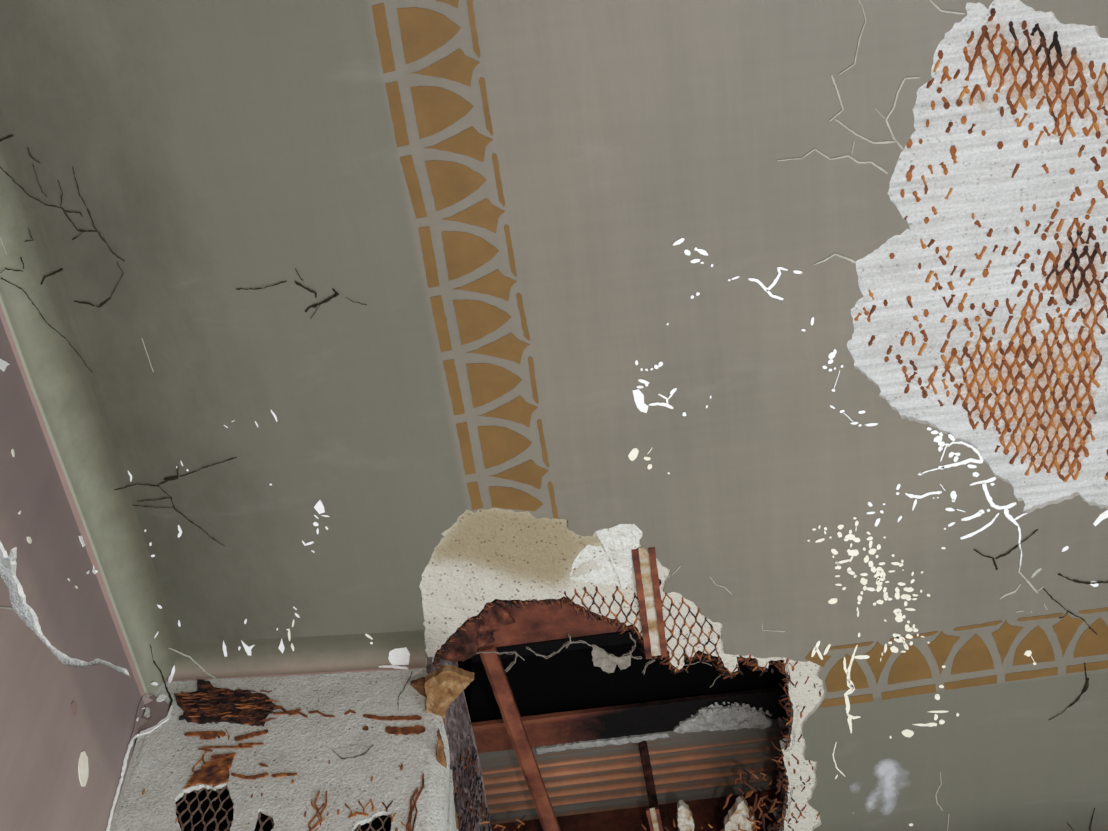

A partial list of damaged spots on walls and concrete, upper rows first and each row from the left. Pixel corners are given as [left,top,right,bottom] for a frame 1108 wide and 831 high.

crack [777,0,921,174]
flaking render [822,0,1108,511]
crack [866,427,1047,613]
crack [1093,510,1108,526]
crack [0,548,127,676]
corrosion [435,600,515,662]
corrosion [174,680,426,789]
peeling [78,751,89,787]
spalling [178,787,234,831]
spalling [254,813,273,831]
corrosion [309,790,327,831]
spalling [354,815,391,831]